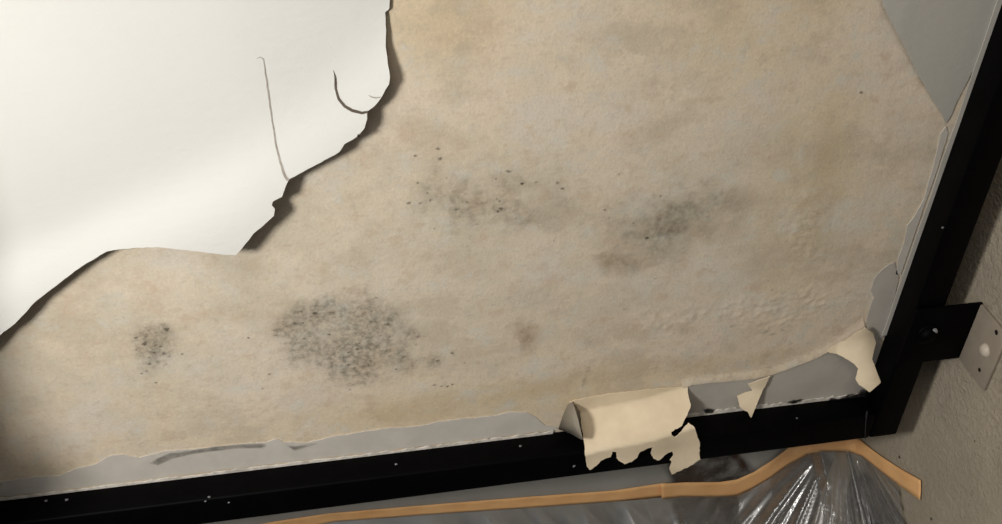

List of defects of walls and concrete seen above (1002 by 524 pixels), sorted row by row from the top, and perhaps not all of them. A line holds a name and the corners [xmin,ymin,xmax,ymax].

peeling [0,0,390,335]
crack [257,57,289,181]
crack [333,70,380,114]
peeling [681,318,881,414]